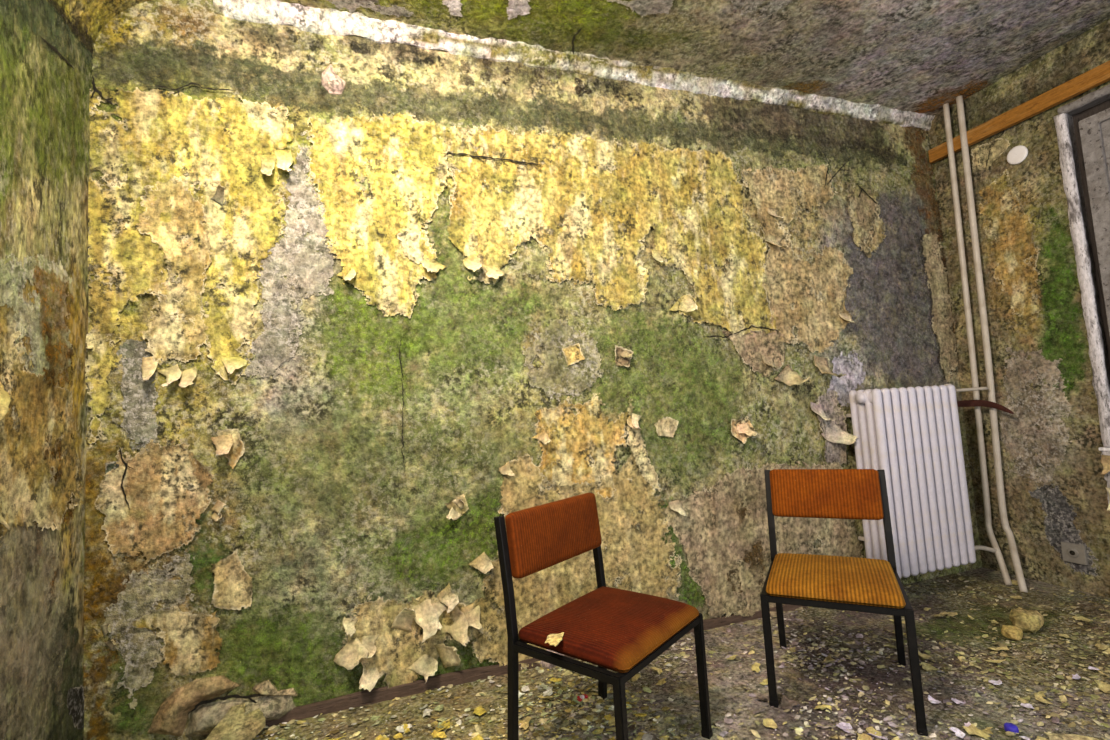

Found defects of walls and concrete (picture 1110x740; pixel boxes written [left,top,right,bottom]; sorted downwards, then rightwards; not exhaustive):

flaking render [442,0,463,17]
flaking render [506,0,532,20]
flaking render [321,64,346,95]
leakage [0,0,908,173]
crack [441,153,540,165]
flaking render [220,130,356,379]
peeling [463,254,505,279]
peeling [670,295,698,313]
flaking render [999,347,1100,576]
peeling [468,552,494,574]
flaking render [100,551,195,709]
peeling [333,584,482,692]